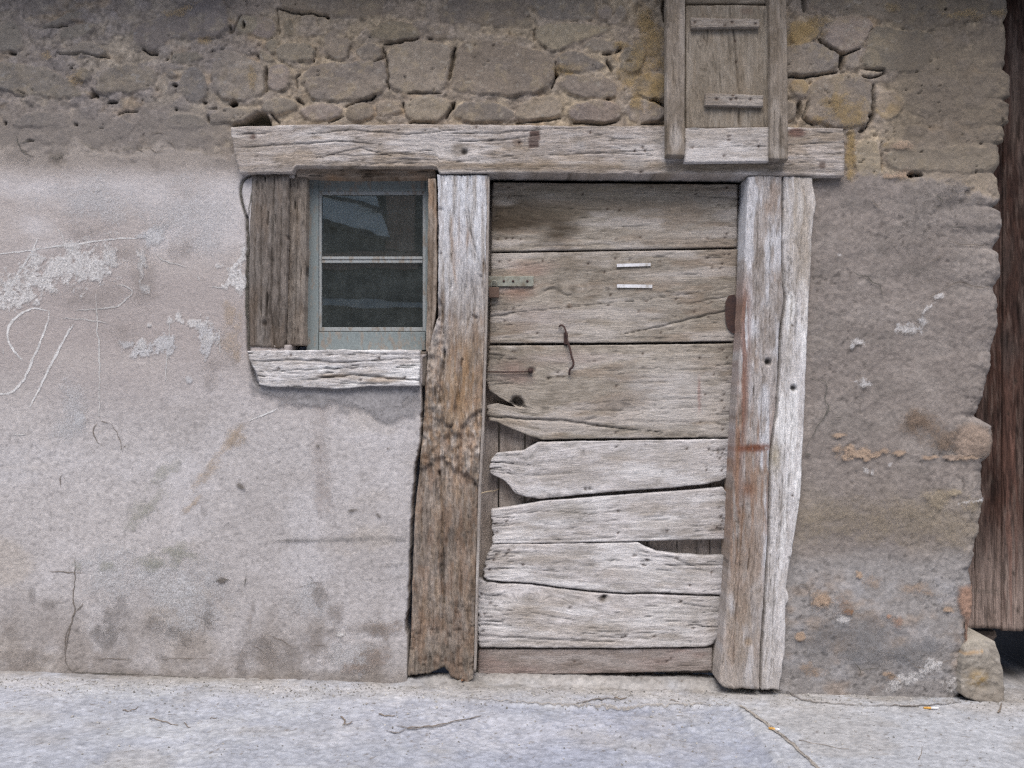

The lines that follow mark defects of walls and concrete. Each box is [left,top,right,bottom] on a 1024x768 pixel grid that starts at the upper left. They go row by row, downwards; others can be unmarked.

peeling [0,238,125,311]
peeling [120,313,220,361]
spalling [833,433,906,474]
crack [50,566,208,678]